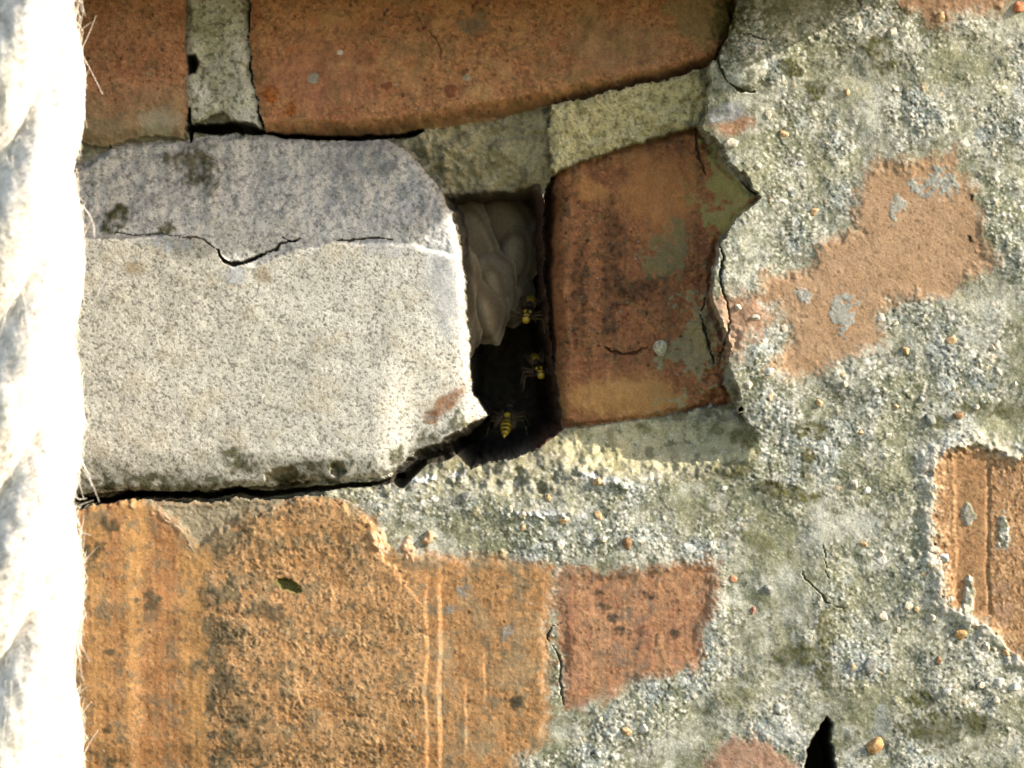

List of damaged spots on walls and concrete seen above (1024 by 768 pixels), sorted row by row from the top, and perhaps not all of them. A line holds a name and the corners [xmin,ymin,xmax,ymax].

crack [695,128,707,175]
crack [115,232,302,267]
crack [341,235,393,243]
crack [701,244,731,365]
peeling [708,146,1003,383]
crack [74,417,494,505]
peeling [932,444,1024,663]
spalling [146,466,437,768]